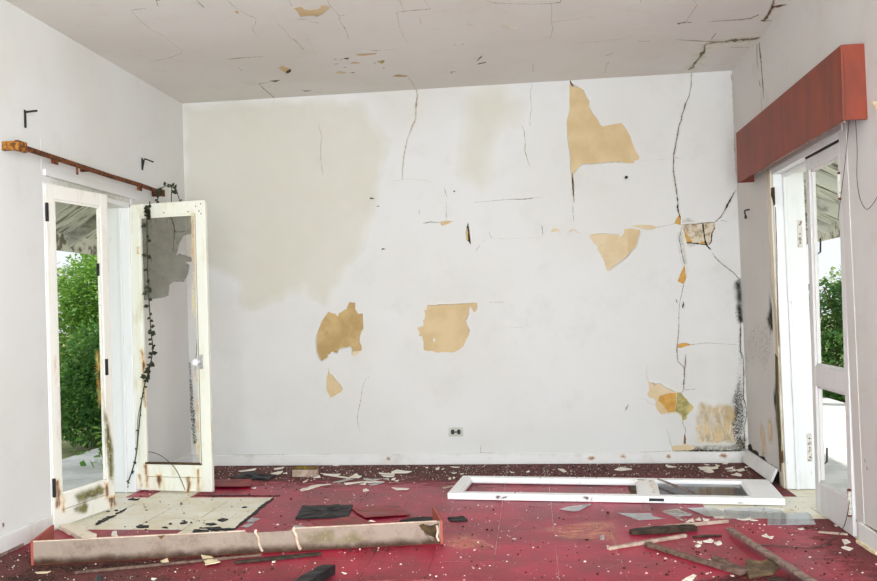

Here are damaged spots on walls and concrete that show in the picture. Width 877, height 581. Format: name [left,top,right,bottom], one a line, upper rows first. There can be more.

peeling [565,80,639,204]
crack [658,0,784,263]
peeling [550,225,658,272]
flaking render [674,213,717,249]
peeling [315,302,365,398]
peeling [418,301,479,353]
crack [677,285,747,449]
water stain [735,281,743,322]